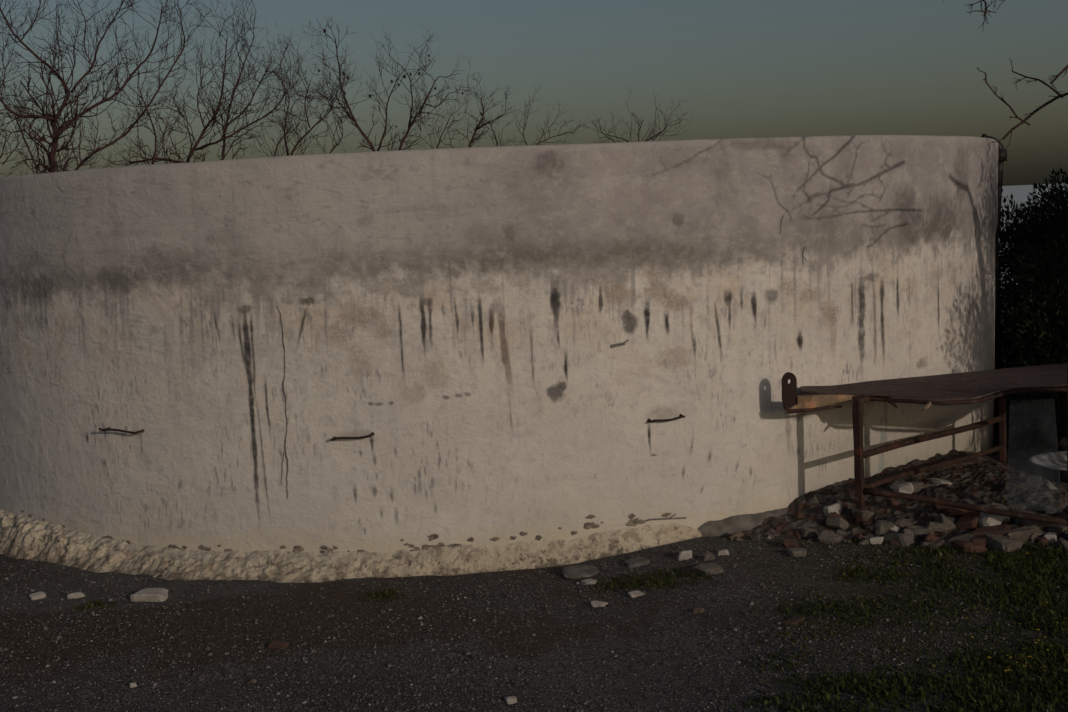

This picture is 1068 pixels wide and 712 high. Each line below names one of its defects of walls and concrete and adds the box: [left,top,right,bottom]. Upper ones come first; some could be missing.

leakage [420,306,432,341]
leakage [478,304,494,352]
leakage [551,290,561,319]
leakage [852,288,865,348]
leakage [239,322,270,490]